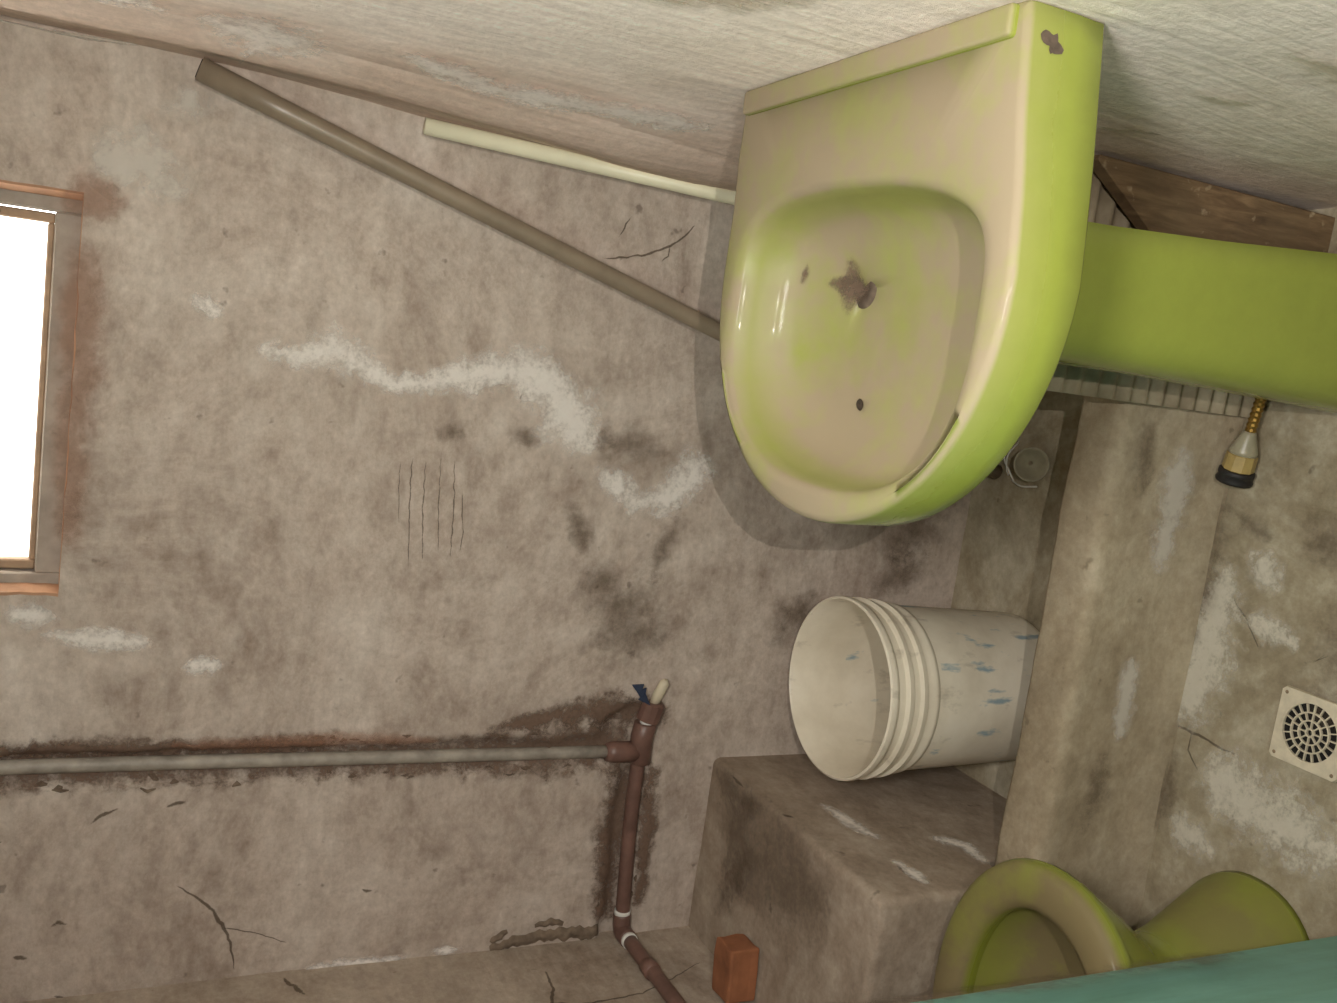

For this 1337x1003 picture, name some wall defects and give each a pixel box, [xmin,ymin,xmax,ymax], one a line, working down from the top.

damp [259,333,599,453]
damp [598,454,712,518]